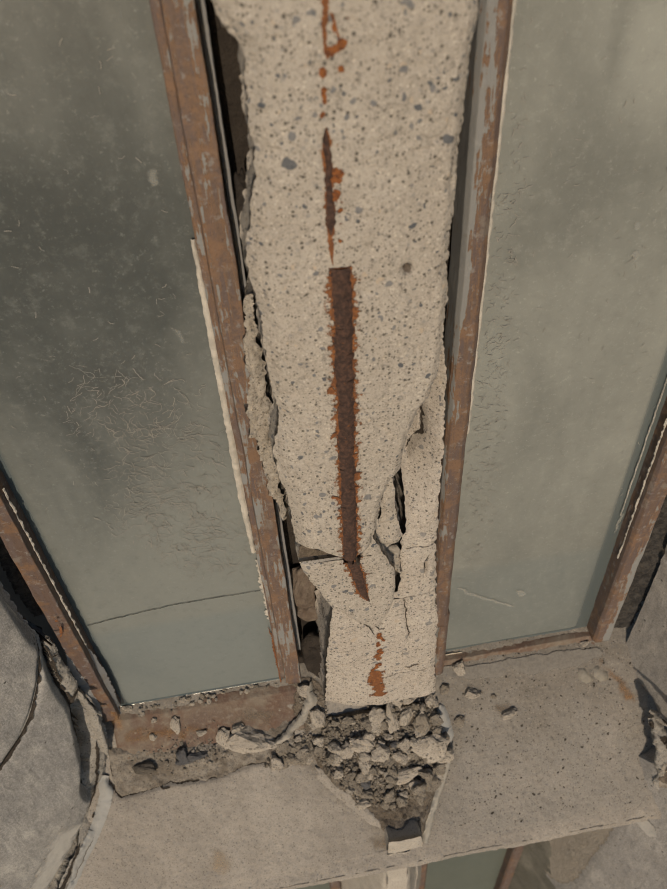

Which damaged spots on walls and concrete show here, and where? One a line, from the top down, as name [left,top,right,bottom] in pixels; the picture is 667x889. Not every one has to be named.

rust [319,0,347,265]
spalling [243,276,289,520]
spalling [323,266,370,602]
crack [298,545,328,558]
spalling [375,477,403,549]
crack [0,630,264,889]
peeling [274,681,317,745]
spalling [315,700,437,836]
rust [367,633,386,697]